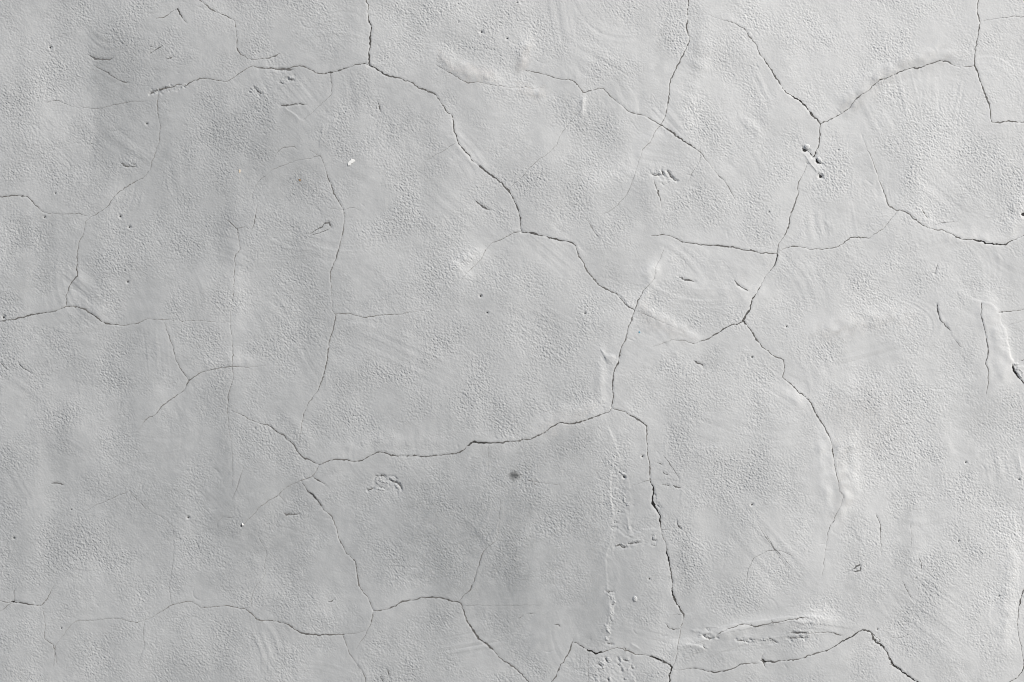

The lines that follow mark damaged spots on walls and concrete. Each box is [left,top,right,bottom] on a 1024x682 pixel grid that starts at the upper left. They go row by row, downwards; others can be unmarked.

crack [0,125,529,682]
crack [152,0,918,682]
crack [652,0,1024,574]
crack [1010,590,1024,682]